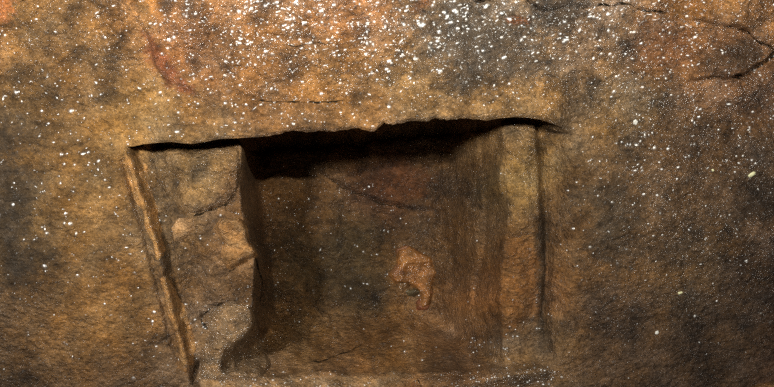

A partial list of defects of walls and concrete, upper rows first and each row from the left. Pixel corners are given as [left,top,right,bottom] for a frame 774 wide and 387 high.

crack [527,1,675,15]
crack [701,19,774,80]